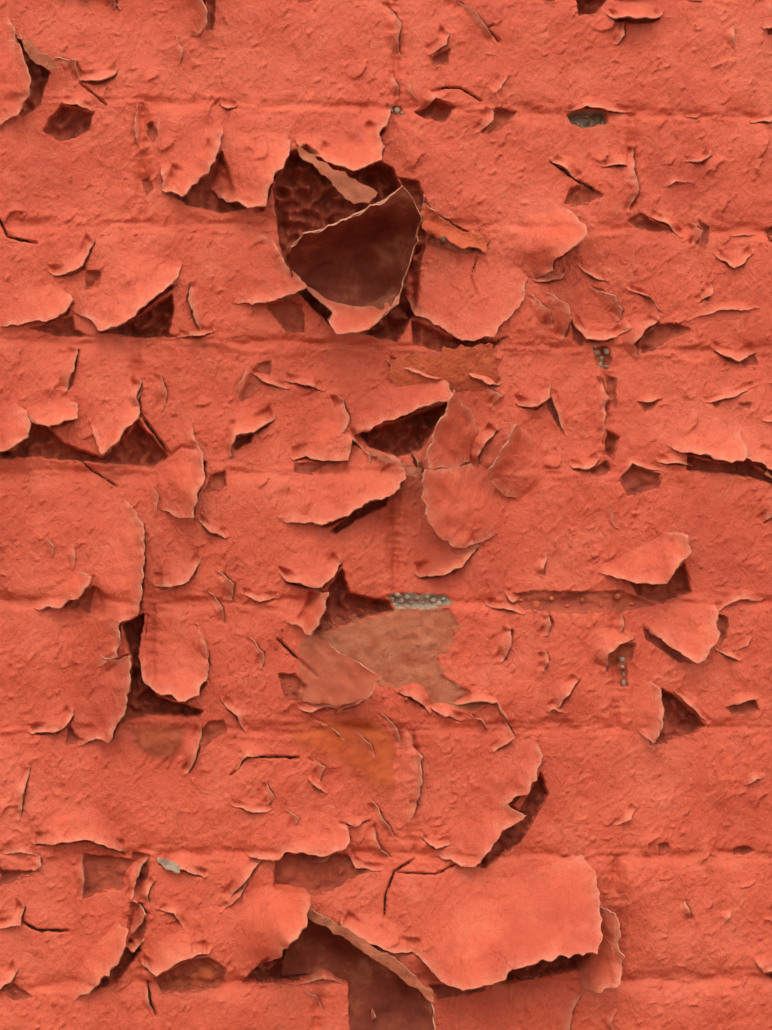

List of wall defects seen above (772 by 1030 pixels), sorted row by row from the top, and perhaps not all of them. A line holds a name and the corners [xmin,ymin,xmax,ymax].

peeling [0,7,119,141]
peeling [0,235,250,777]
peeling [0,546,625,1030]
peeling [134,0,772,578]
peeling [484,530,763,745]